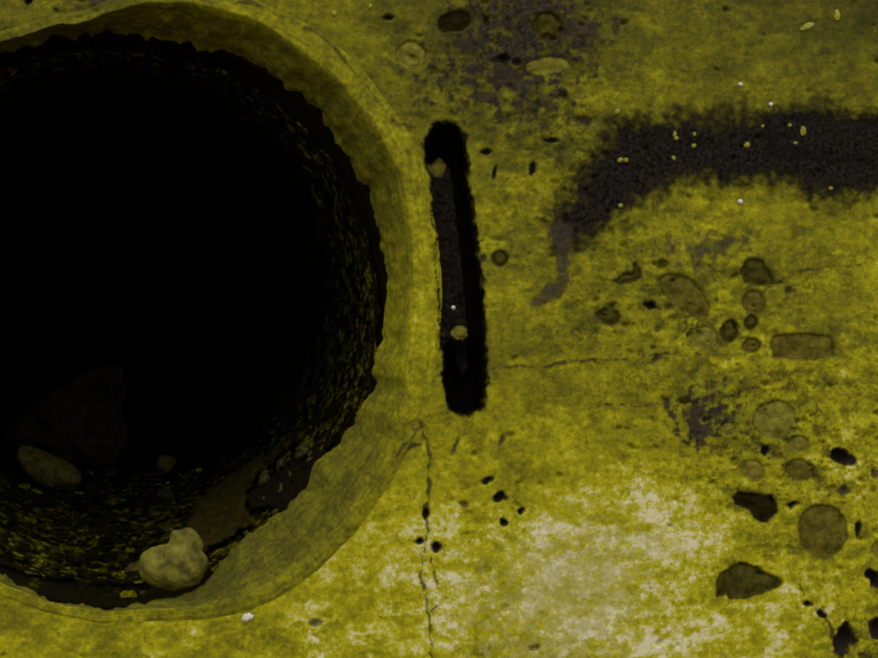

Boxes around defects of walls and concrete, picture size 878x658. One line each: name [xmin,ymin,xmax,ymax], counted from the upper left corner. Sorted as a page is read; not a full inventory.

leakage [532,101,878,306]
crack [383,432,438,656]